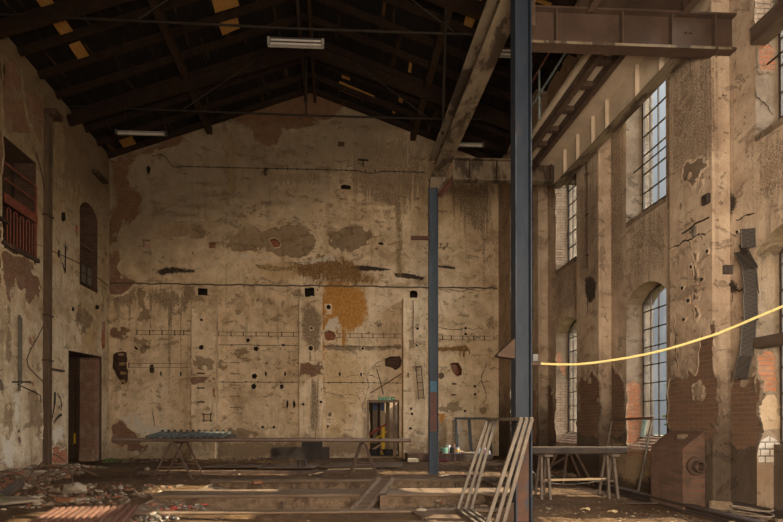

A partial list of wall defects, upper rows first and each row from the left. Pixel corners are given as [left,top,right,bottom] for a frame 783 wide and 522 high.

spalling [756,42,778,74]
spalling [227,93,346,150]
crack [754,88,774,115]
water stain [346,129,427,219]
spalling [0,135,186,388]
crack [670,229,711,250]
crack [730,212,755,237]
corrosion [252,251,378,444]
spalling [665,247,780,455]
flaking render [0,376,44,446]
spalling [532,351,602,447]
spalling [611,362,643,445]